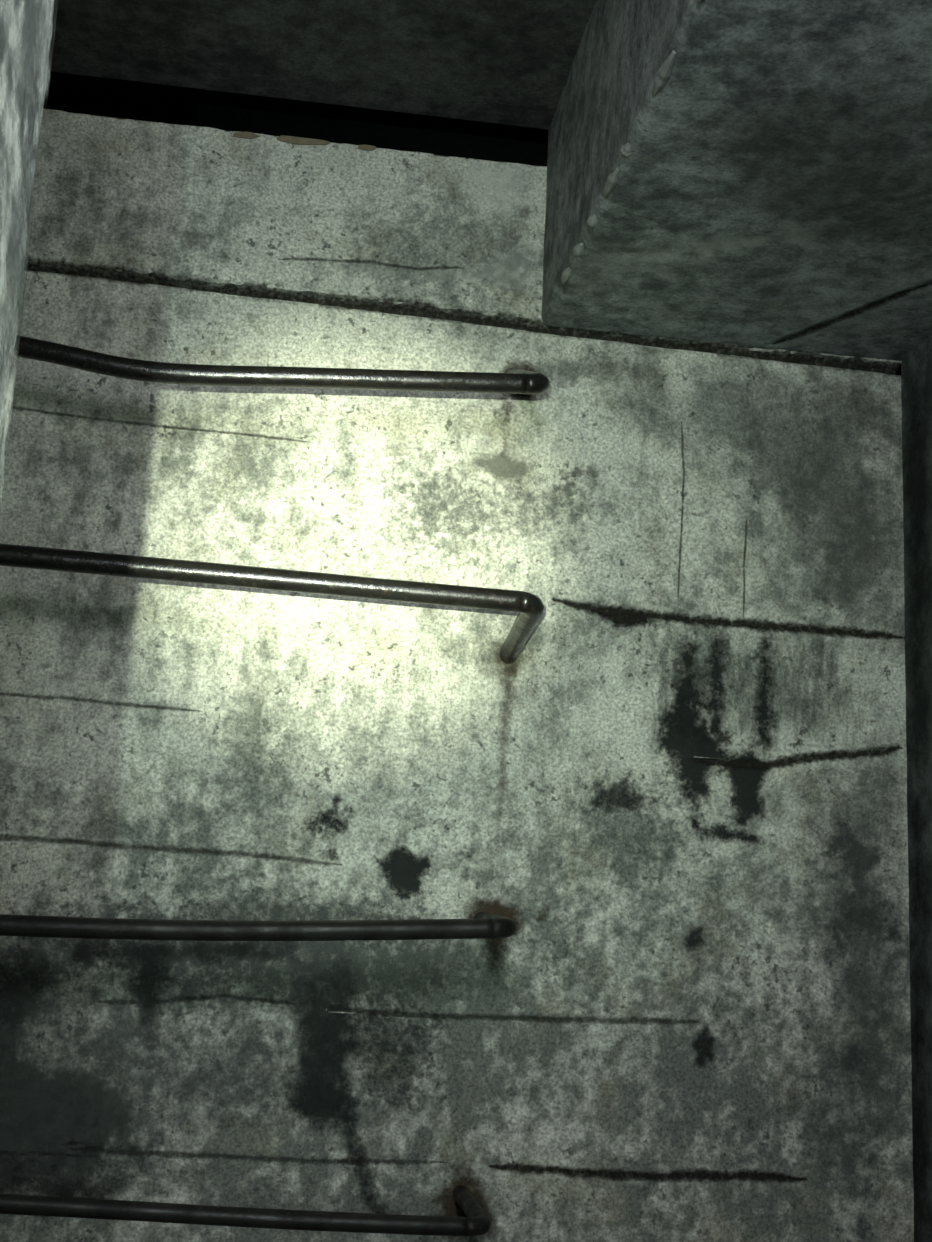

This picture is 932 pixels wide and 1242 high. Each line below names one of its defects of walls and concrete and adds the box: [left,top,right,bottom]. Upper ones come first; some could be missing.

crack [552,431,903,639]
water stain [658,638,775,843]
crack [693,746,903,769]
crack [0,836,343,865]
water stain [104,847,434,920]
water stain [307,797,352,833]
water stain [0,936,470,1214]
crack [489,1163,807,1182]